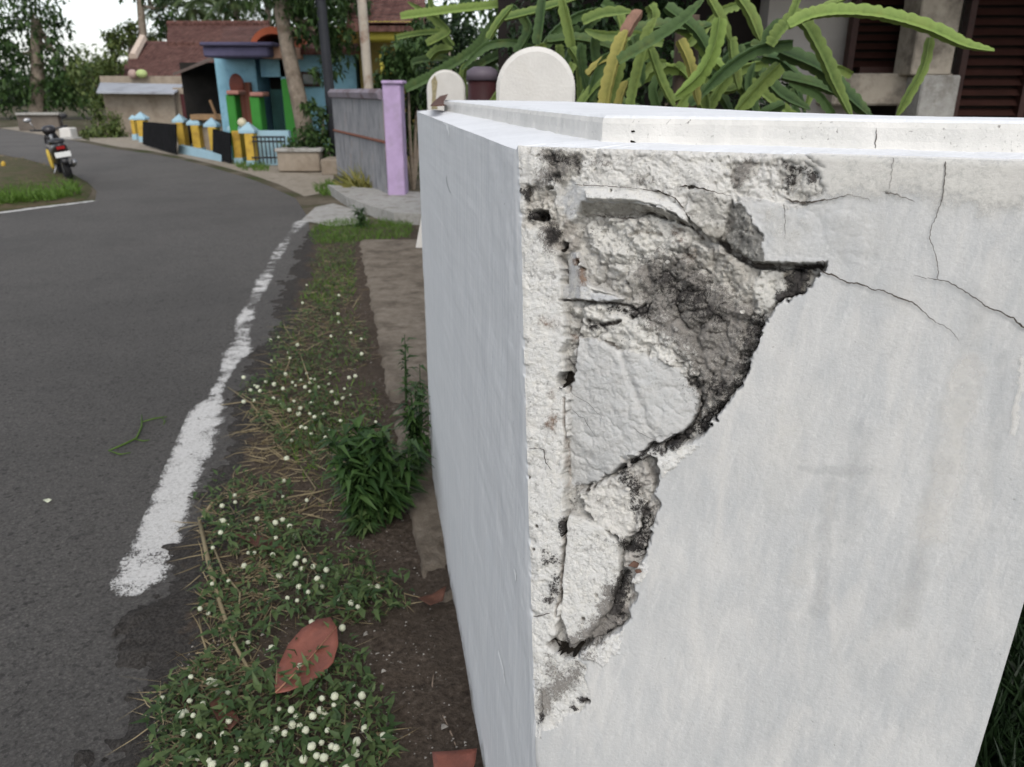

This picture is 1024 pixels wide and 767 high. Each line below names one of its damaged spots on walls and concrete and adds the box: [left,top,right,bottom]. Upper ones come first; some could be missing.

spalling [518,145,828,739]
crack [783,129,1024,339]